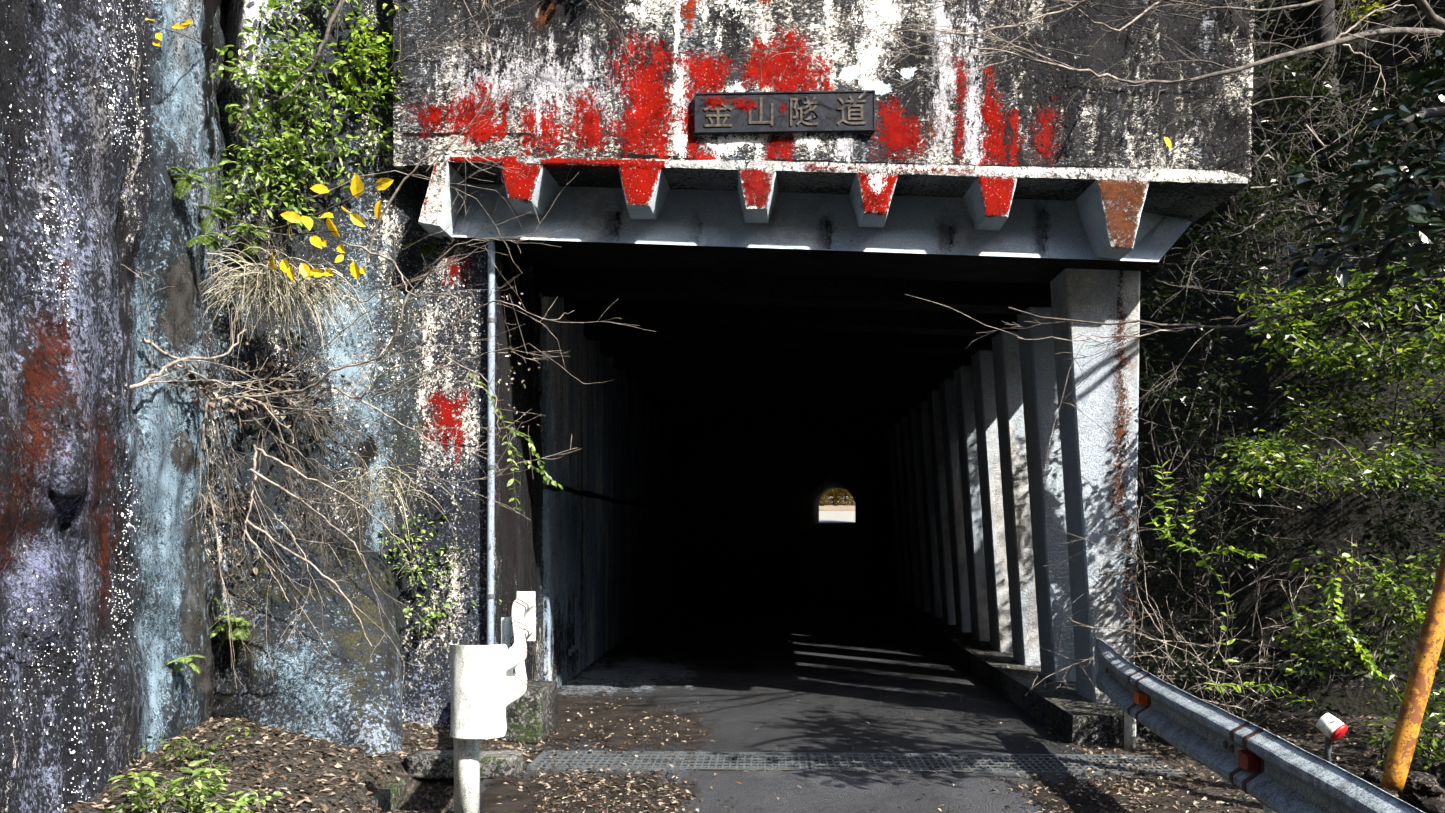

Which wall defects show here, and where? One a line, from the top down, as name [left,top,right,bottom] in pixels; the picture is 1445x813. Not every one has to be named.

leakage [416,0,771,169]
leakage [793,0,1111,195]
corrosion [1096,177,1150,250]
corrosion [0,258,127,629]
corrosion [1105,270,1136,655]